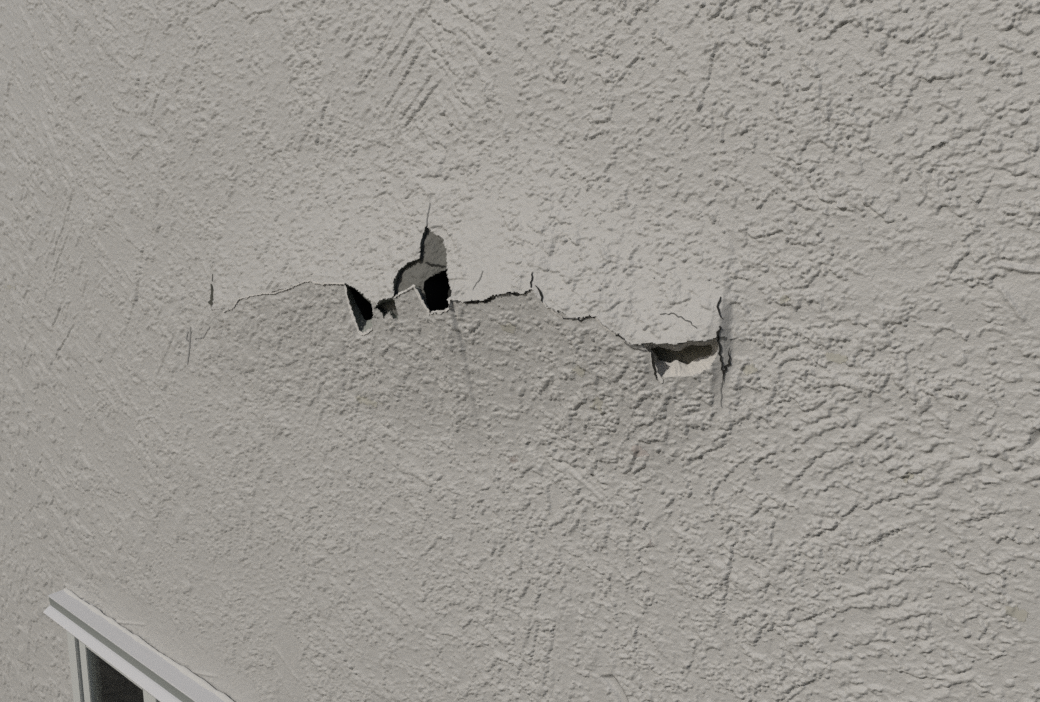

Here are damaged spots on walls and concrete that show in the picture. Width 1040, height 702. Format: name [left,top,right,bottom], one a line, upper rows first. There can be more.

spalling [344,225,452,335]
spalling [645,336,718,383]
crack [662,296,731,407]